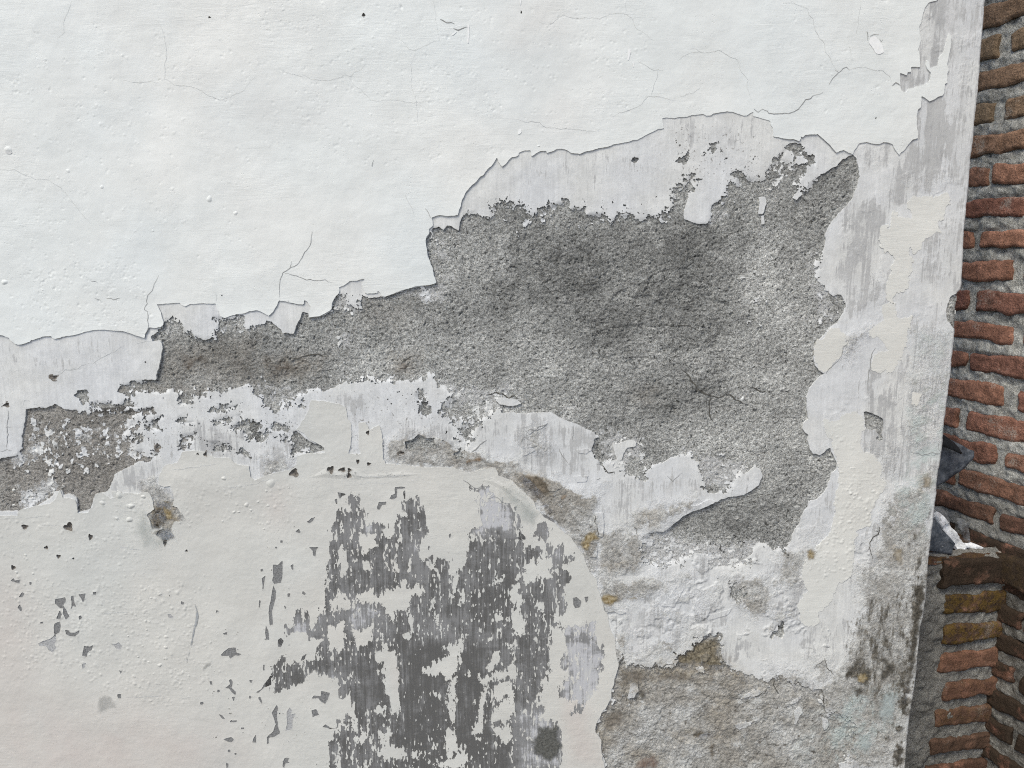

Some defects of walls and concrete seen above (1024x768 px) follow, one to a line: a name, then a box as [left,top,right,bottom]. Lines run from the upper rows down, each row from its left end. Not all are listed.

crack [682,4,900,114]
crack [279,235,327,304]
crack [639,362,772,421]
peeling [377,487,405,510]
peeling [358,528,394,571]
peeling [39,592,96,652]
peeling [259,561,306,647]
peeling [449,574,465,605]
peeling [221,648,241,659]
peeling [312,545,439,768]
peeling [422,579,588,768]
peeling [253,705,295,744]